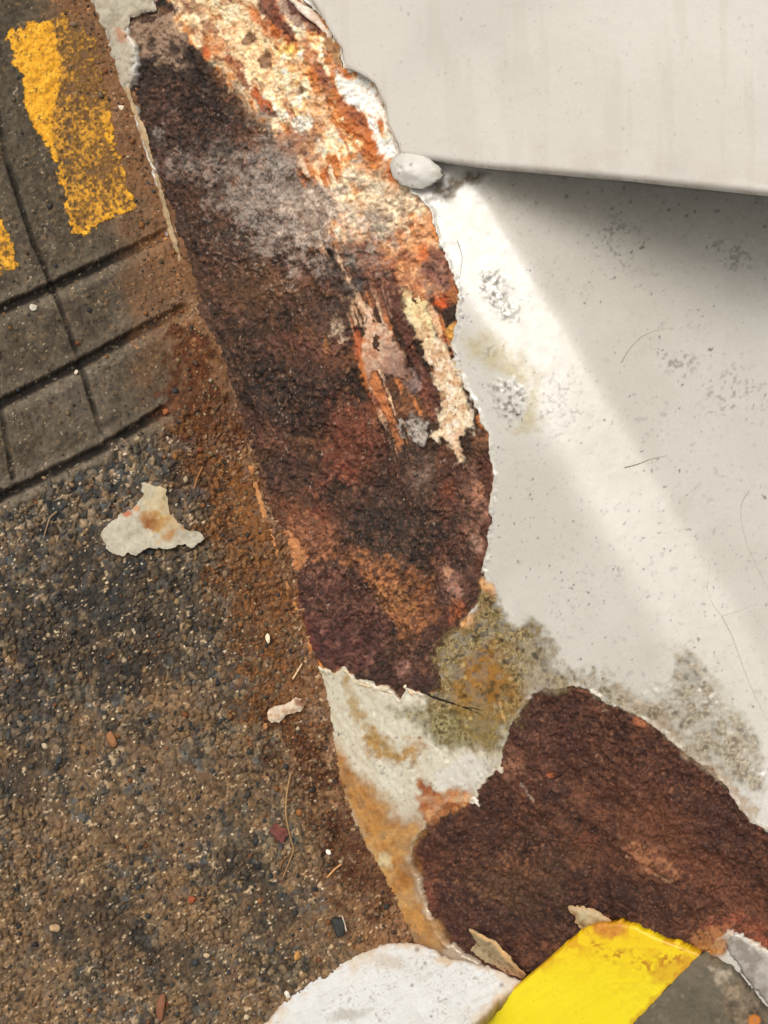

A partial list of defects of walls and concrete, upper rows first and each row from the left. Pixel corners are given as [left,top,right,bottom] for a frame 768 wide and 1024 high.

peeling [91,0,157,90]
rust [125,0,495,734]
damp [562,654,762,820]
rust [259,686,768,981]
peeling [469,928,526,979]
peeling [568,905,611,929]